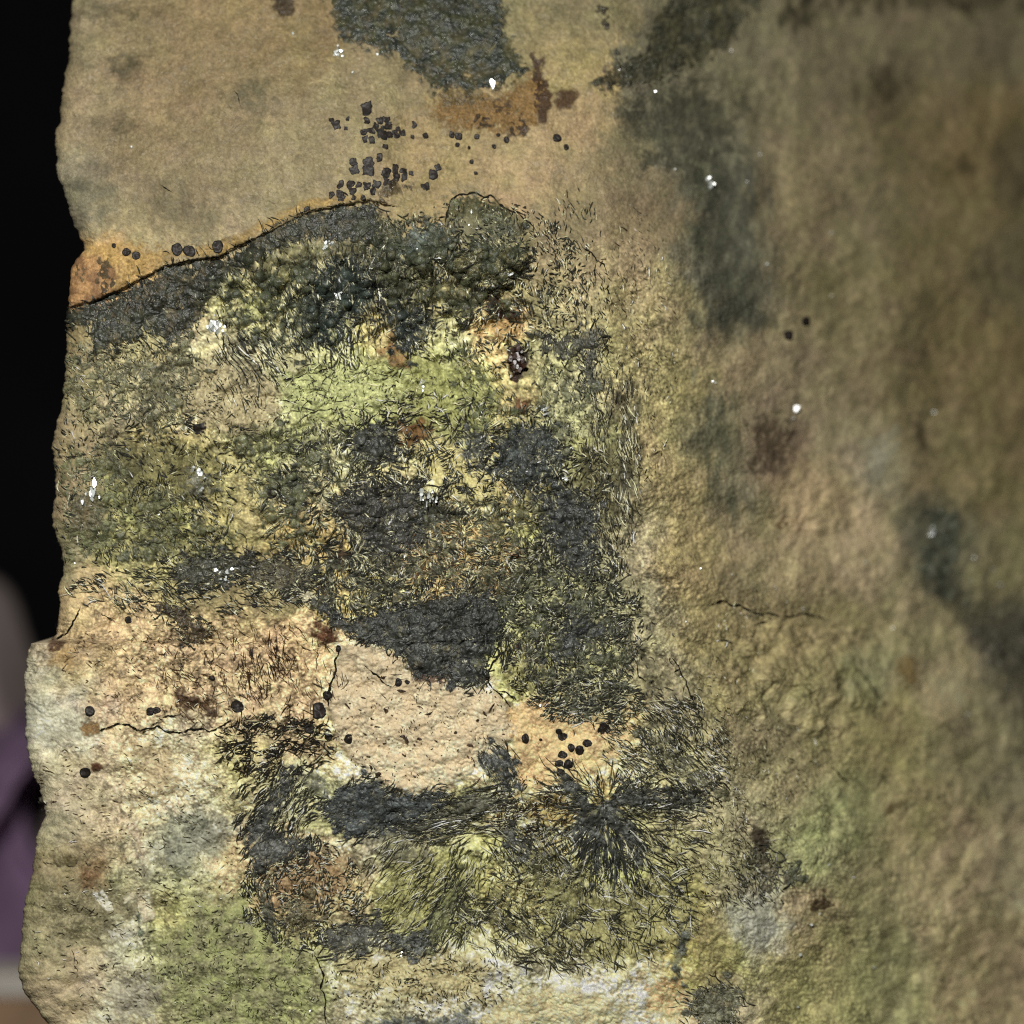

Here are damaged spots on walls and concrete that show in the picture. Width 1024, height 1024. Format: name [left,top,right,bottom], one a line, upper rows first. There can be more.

rust [428,53,579,137]
crack [712,600,826,625]
crack [98,714,234,733]